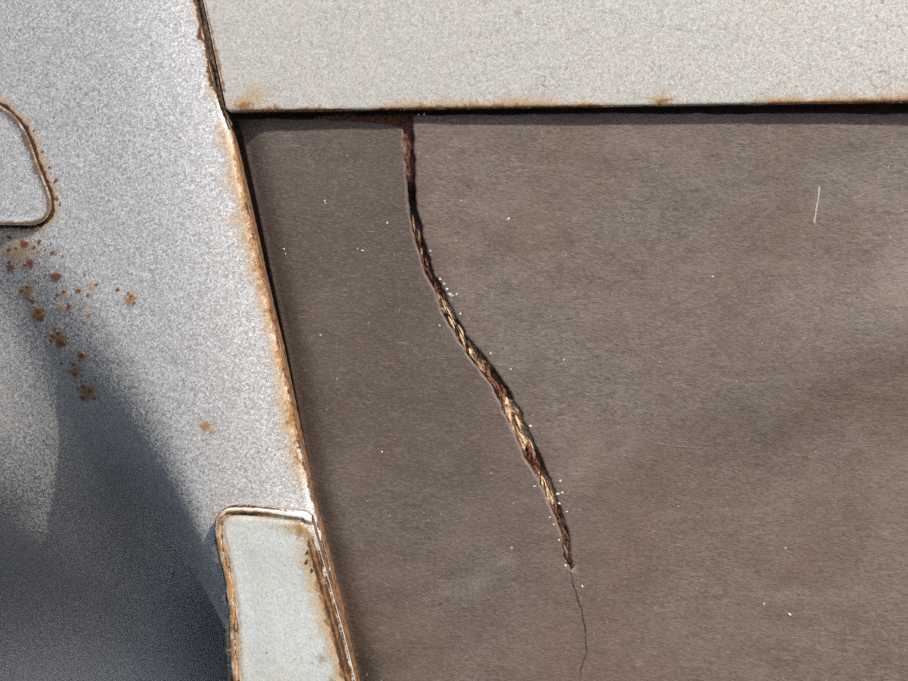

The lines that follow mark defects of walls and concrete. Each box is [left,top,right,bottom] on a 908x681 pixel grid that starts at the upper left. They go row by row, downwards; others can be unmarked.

corrosion [0,101,96,402]
corrosion [214,135,355,681]
corrosion [235,97,352,112]
crack [313,113,587,680]
corrosion [380,99,608,110]
corrosion [742,95,908,105]